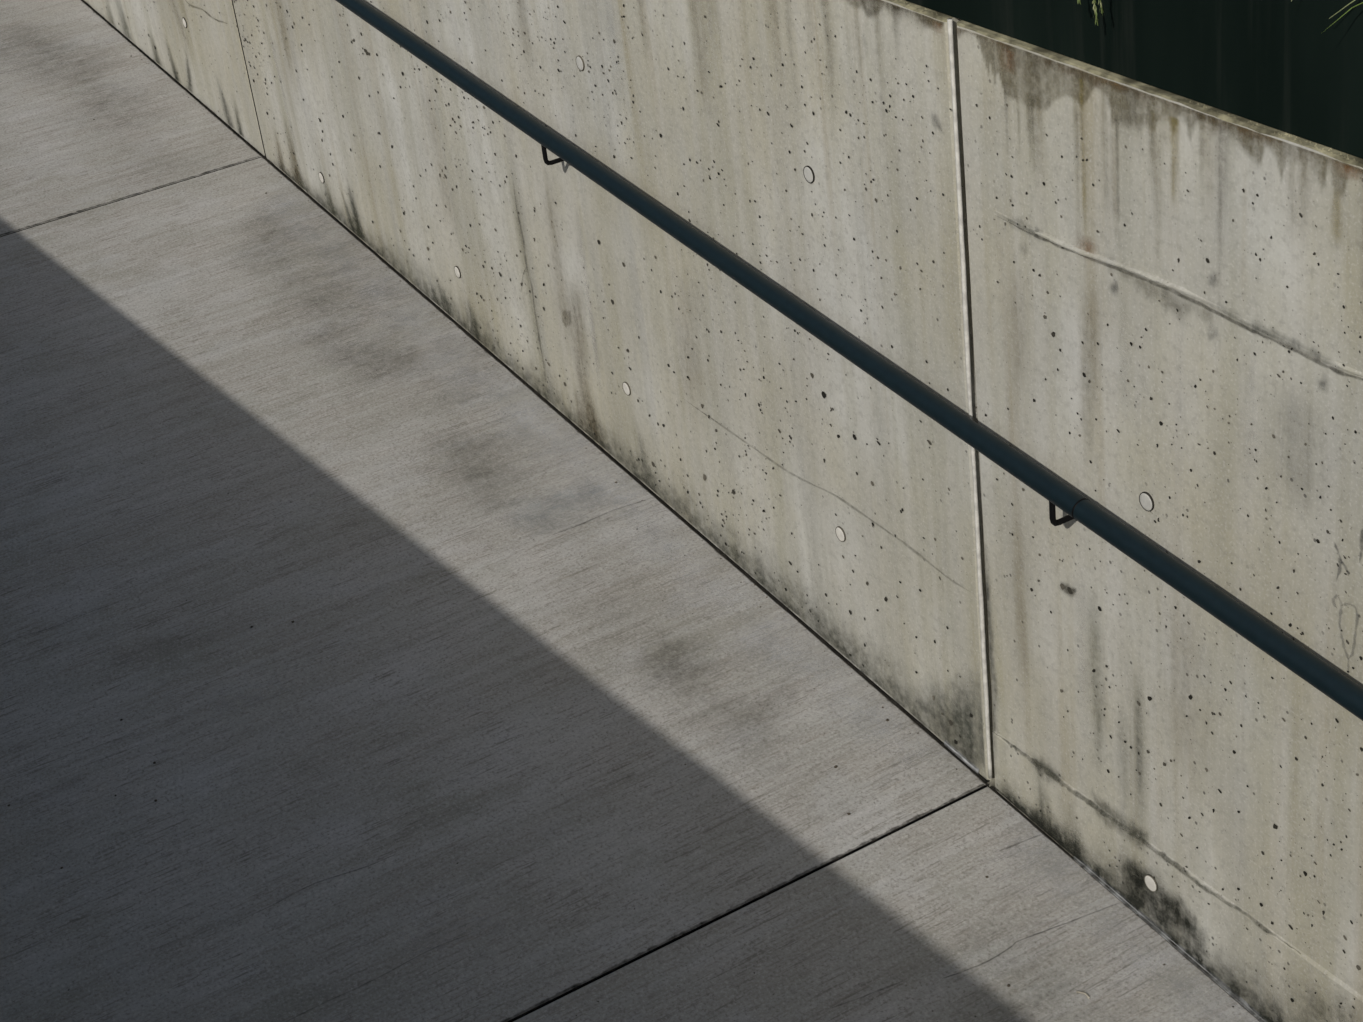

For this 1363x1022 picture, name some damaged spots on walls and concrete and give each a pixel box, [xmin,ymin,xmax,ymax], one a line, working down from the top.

leakage [979,35,1285,158]
crack [1150,282,1254,332]
leakage [1124,864,1196,938]